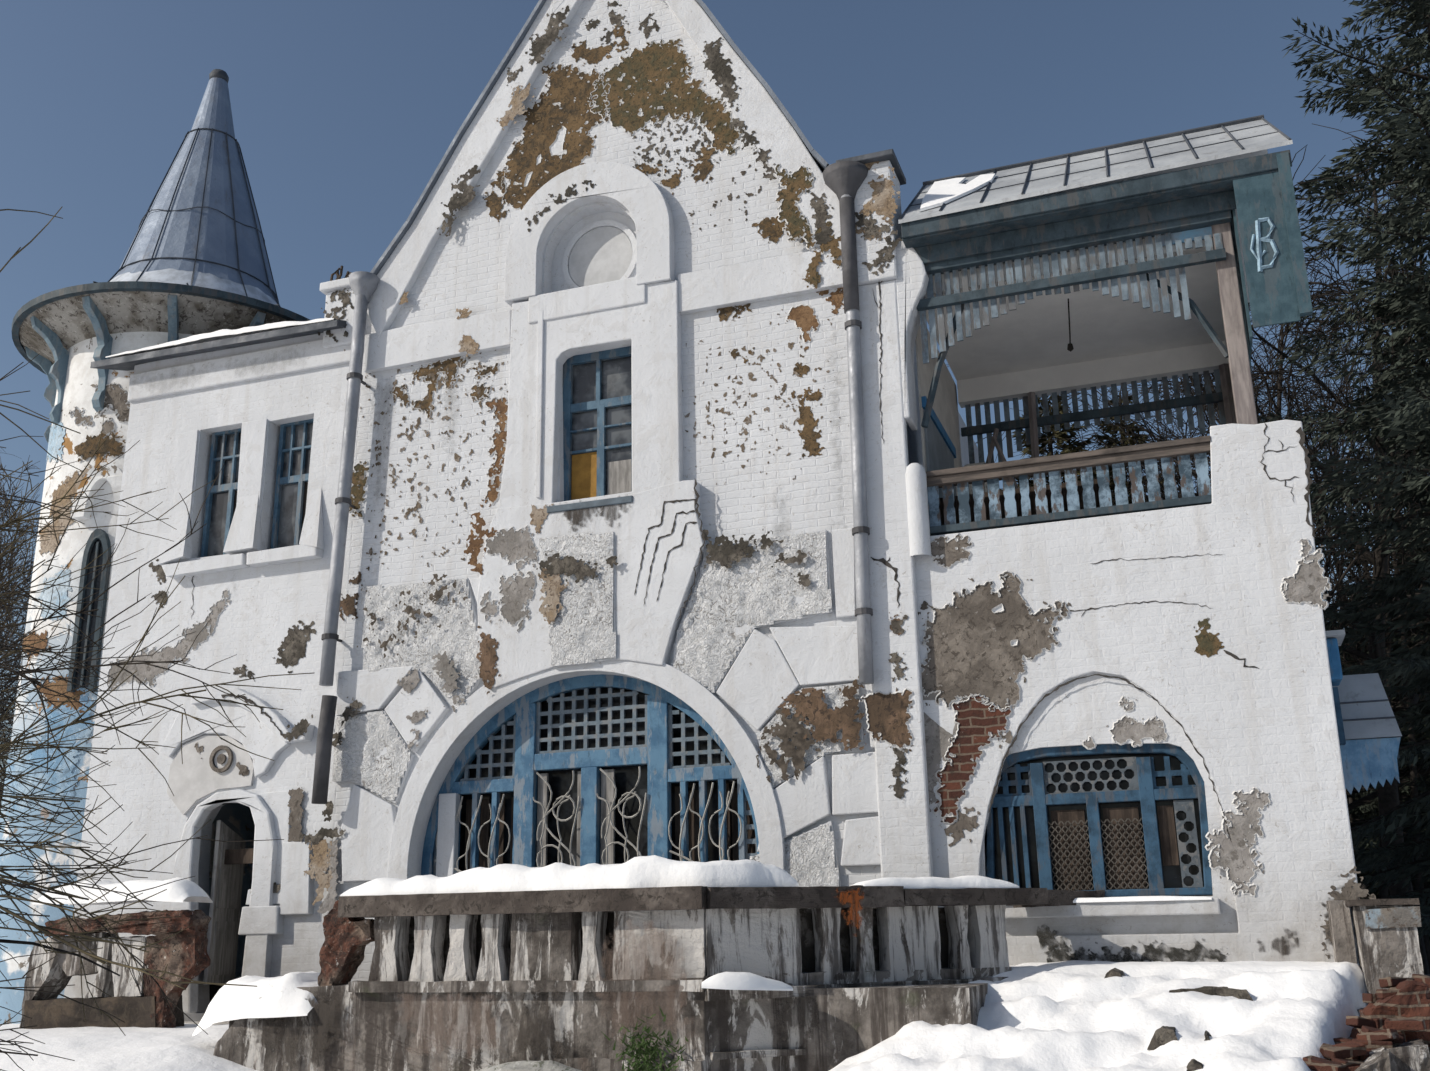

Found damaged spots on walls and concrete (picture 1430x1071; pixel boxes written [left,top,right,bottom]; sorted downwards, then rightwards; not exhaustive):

peeling [437,1,902,480]
peeling [23,383,130,657]
peeling [339,308,618,694]
flaking render [701,529,811,587]
crack [1260,424,1315,539]
peeling [1280,538,1332,610]
peeling [107,589,232,690]
peeling [273,620,316,673]
peeling [1,670,96,812]
peeling [756,570,1071,847]
peeling [1205,787,1272,897]
rust [837,888,864,936]